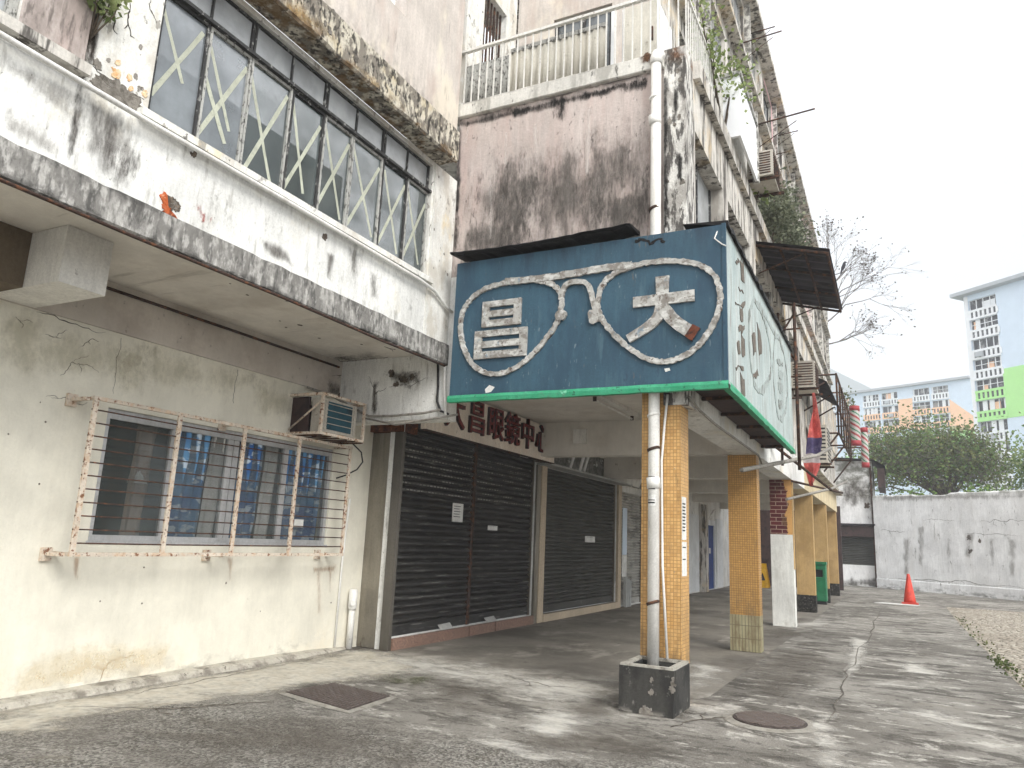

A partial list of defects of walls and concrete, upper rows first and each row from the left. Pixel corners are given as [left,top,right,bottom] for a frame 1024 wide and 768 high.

damp [84,4,100,61]
peeling [89,58,148,111]
damp [70,95,78,152]
damp [92,106,128,173]
damp [455,78,647,251]
damp [664,78,682,226]
spalling [159,191,181,218]
damp [265,243,288,260]
crack [16,312,121,405]
spalling [639,677,654,716]
crack [828,617,878,721]